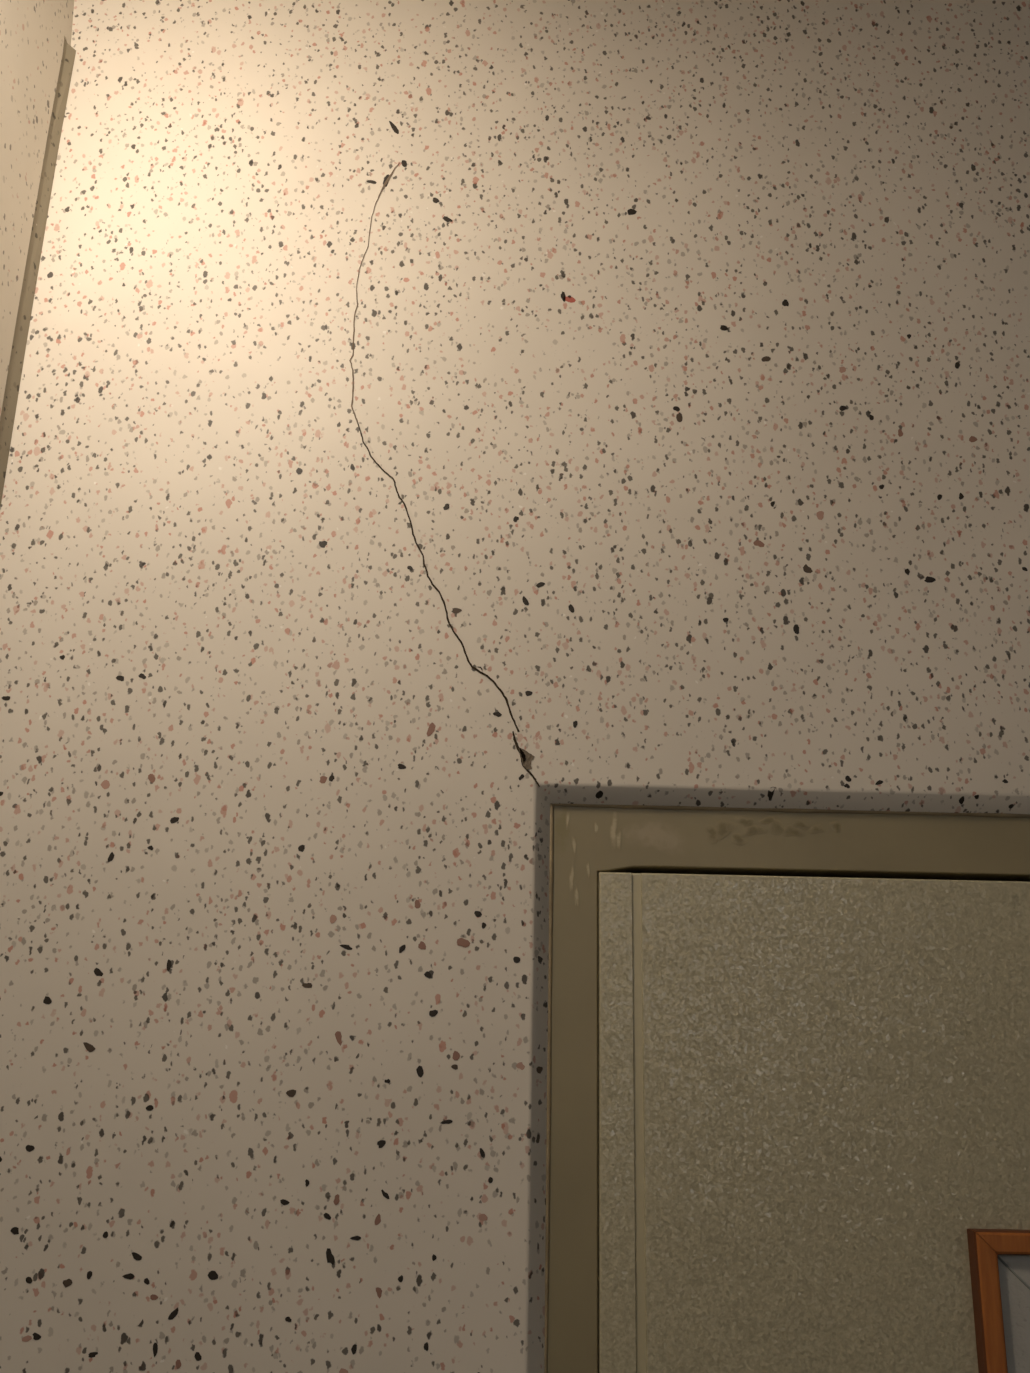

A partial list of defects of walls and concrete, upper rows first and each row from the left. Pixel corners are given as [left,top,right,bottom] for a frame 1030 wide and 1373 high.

crack [349,164,540,787]